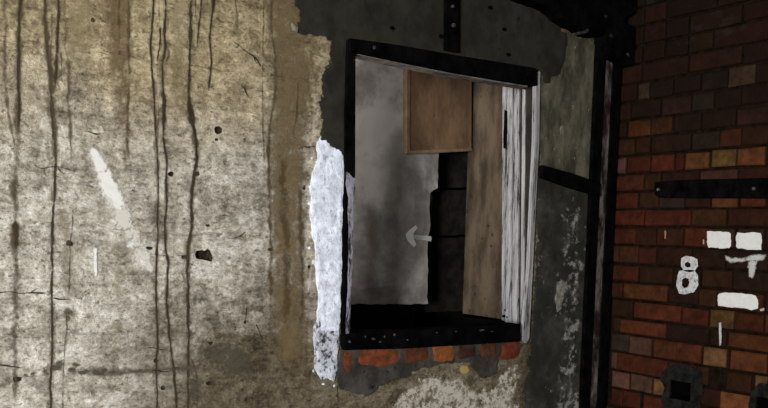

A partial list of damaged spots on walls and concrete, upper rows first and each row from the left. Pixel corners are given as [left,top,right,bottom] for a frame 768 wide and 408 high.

water stain [6,0,23,142]
water stain [9,154,18,211]
water stain [11,0,252,408]
spalling [181,249,213,262]
peeling [291,0,588,408]